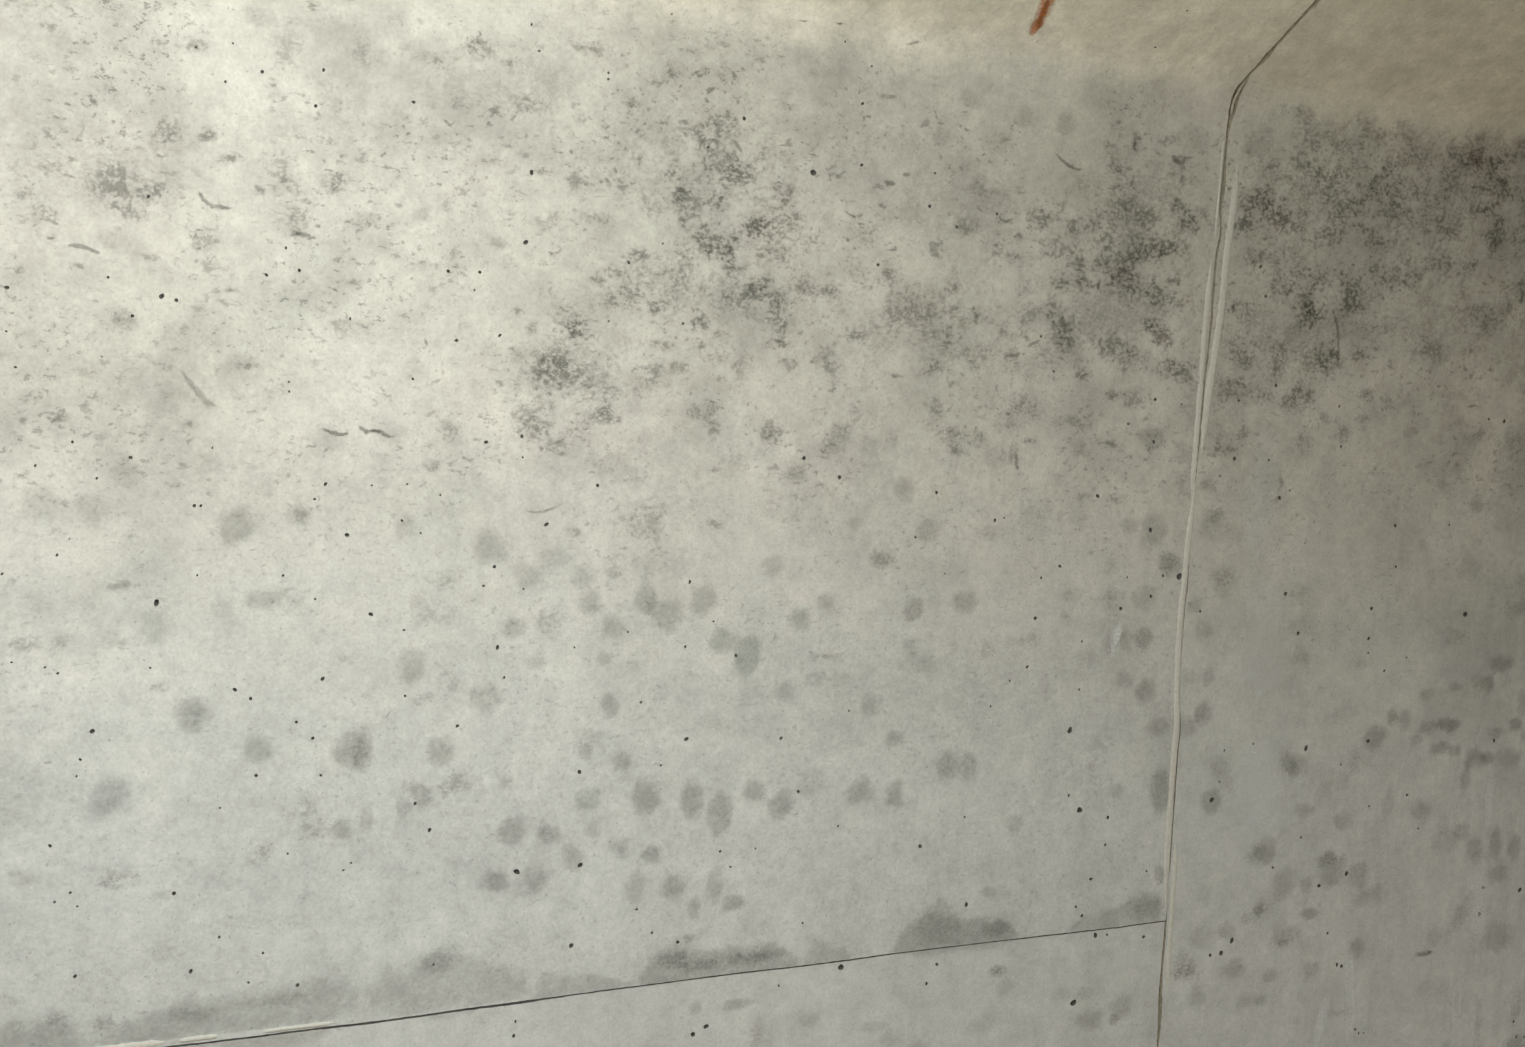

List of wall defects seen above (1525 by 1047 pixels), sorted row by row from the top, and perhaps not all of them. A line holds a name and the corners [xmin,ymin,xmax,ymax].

rust [1030,0,1054,35]
crack [166,0,1321,1047]
crack [95,1039,165,1047]